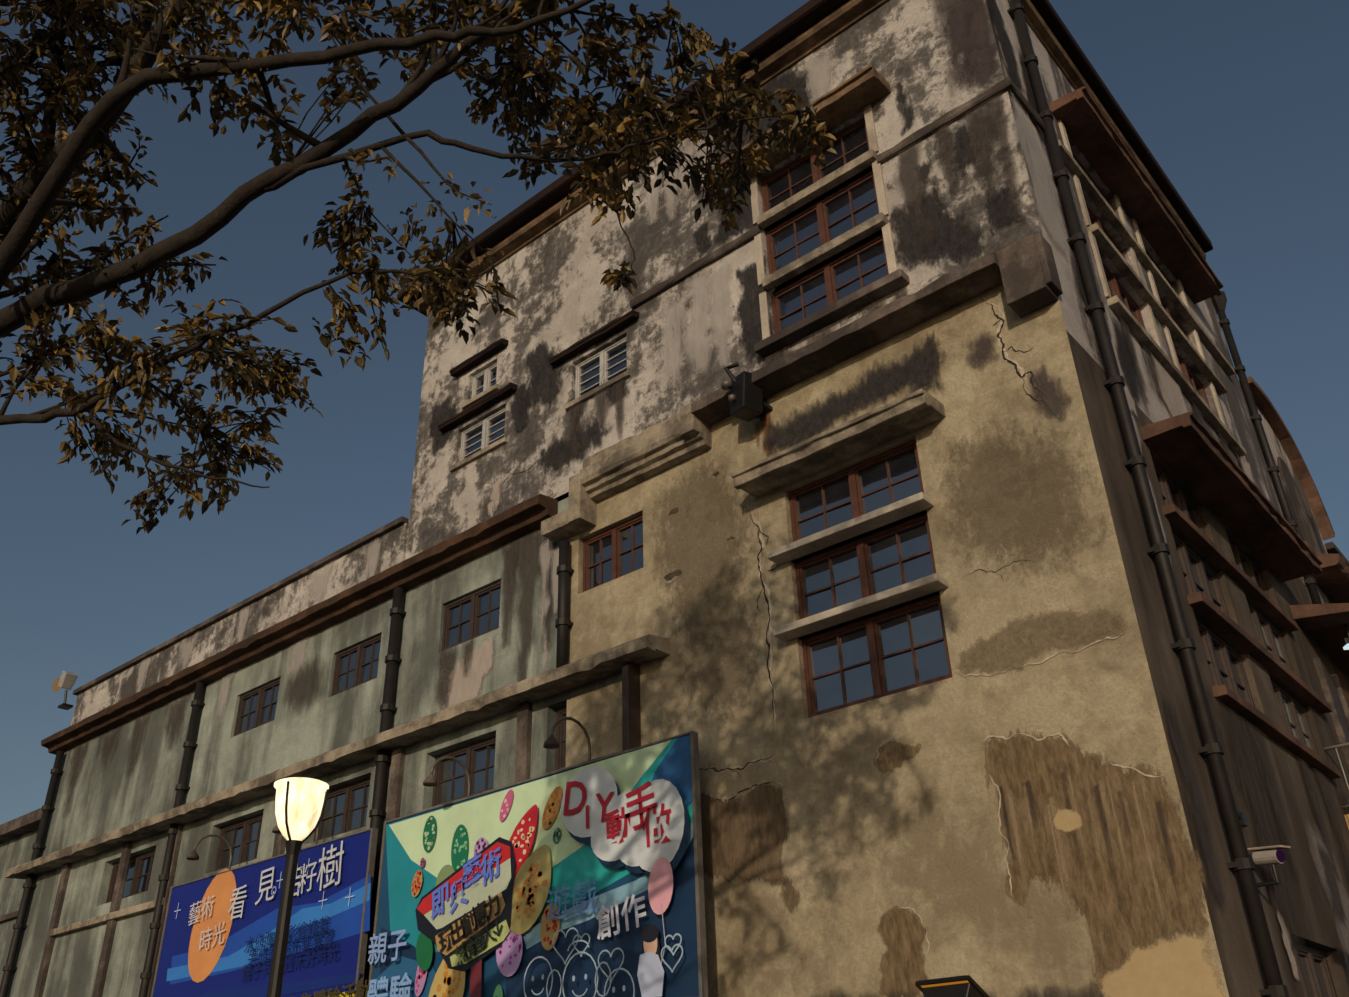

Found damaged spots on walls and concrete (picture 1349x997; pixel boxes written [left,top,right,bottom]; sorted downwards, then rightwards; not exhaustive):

leakage [889,0,1045,269]
leakage [428,398,456,456]
leakage [510,341,563,432]
leakage [540,379,630,475]
crack [980,296,1037,401]
leakage [1030,366,1070,420]
leakage [488,479,502,517]
flaking render [956,609,1125,677]
flaking render [873,740,921,773]
flaking render [700,781,800,912]
flaking render [984,728,1208,991]